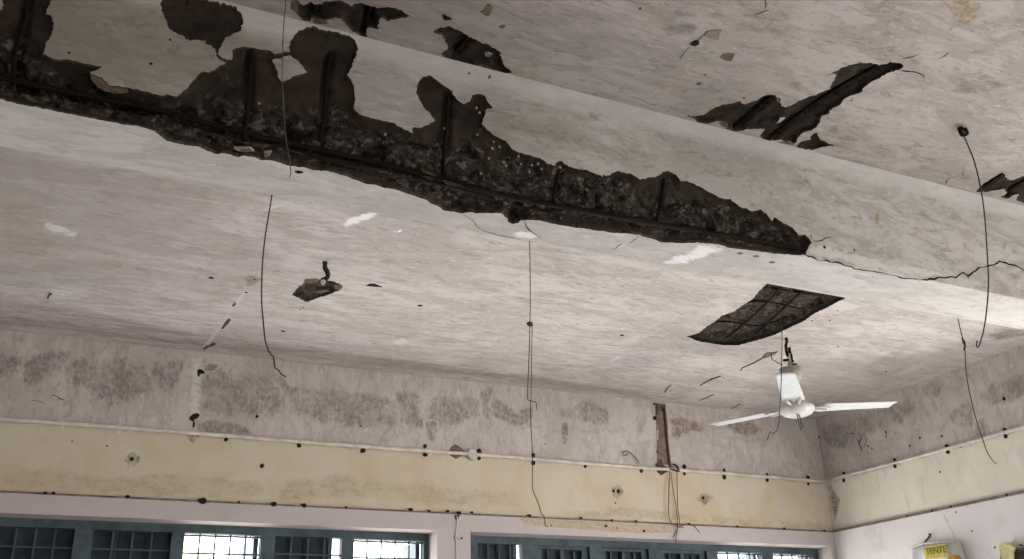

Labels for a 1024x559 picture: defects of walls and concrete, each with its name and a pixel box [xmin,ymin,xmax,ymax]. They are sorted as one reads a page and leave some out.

spalling [0,0,812,255]
spalling [687,55,924,150]
spalling [977,173,1024,203]
crack [806,237,1024,281]
spalling [292,278,343,302]
spalling [687,284,844,345]
water stain [0,347,614,447]